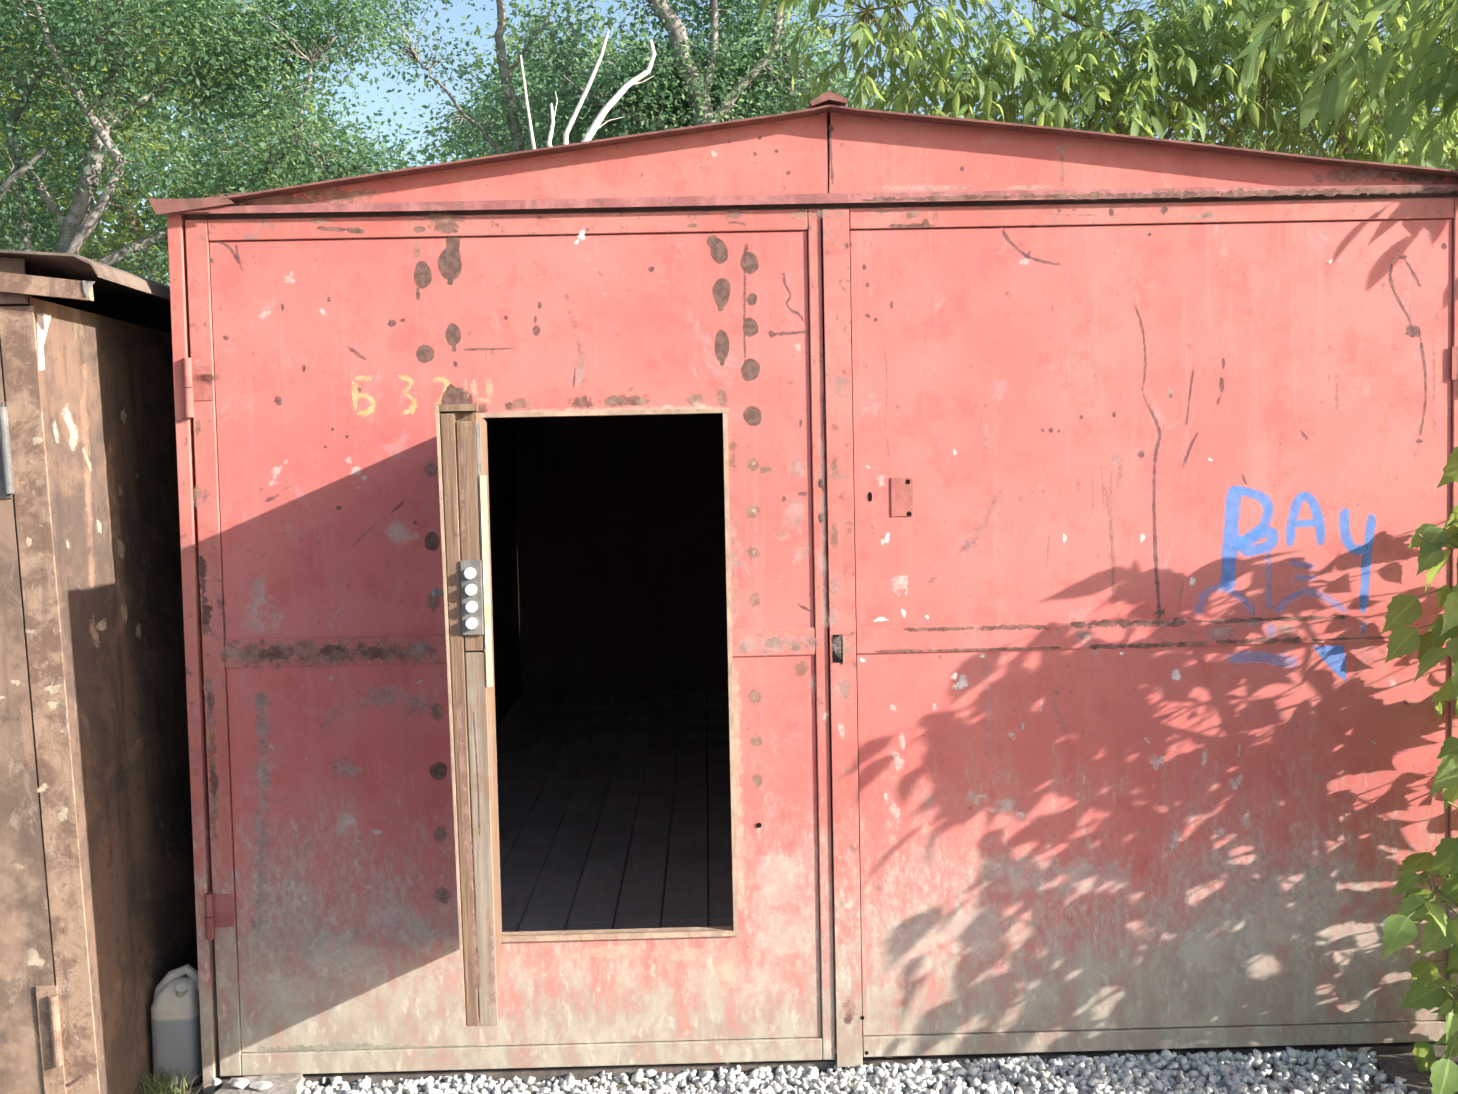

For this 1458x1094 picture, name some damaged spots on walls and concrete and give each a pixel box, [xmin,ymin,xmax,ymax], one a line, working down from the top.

rust [198,555,213,634]
rust [221,638,439,669]
rust [873,624,1061,653]
rust [1071,614,1388,649]
peeling [953,672,967,690]
peeling [891,734,905,769]
damp [251,692,271,933]
damp [987,858,1127,892]
damp [888,908,1013,975]